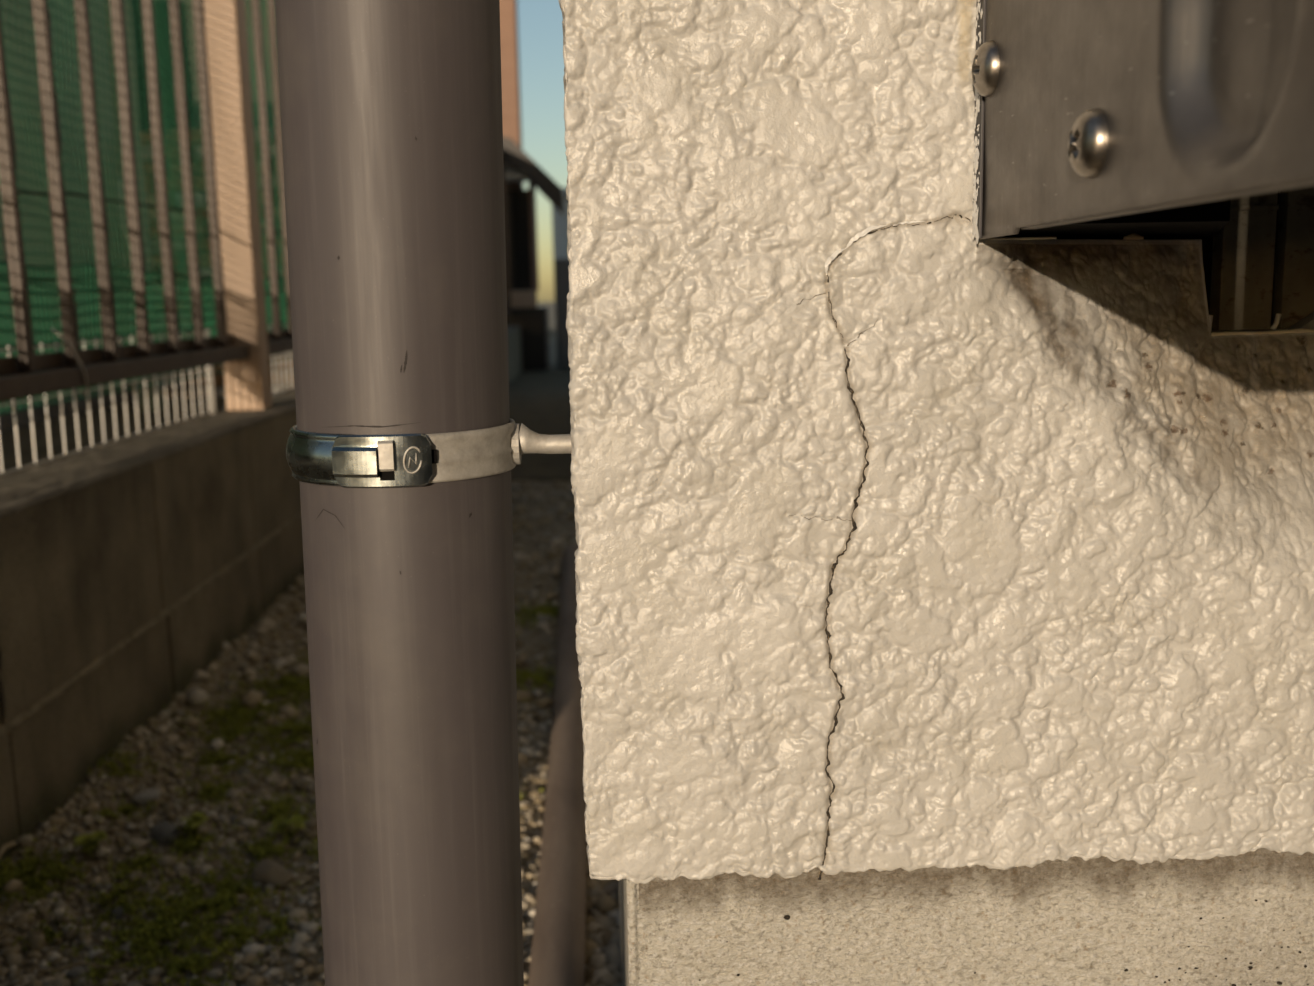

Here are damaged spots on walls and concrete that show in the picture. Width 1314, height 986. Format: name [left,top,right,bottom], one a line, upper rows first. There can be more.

crack [792,214,971,880]